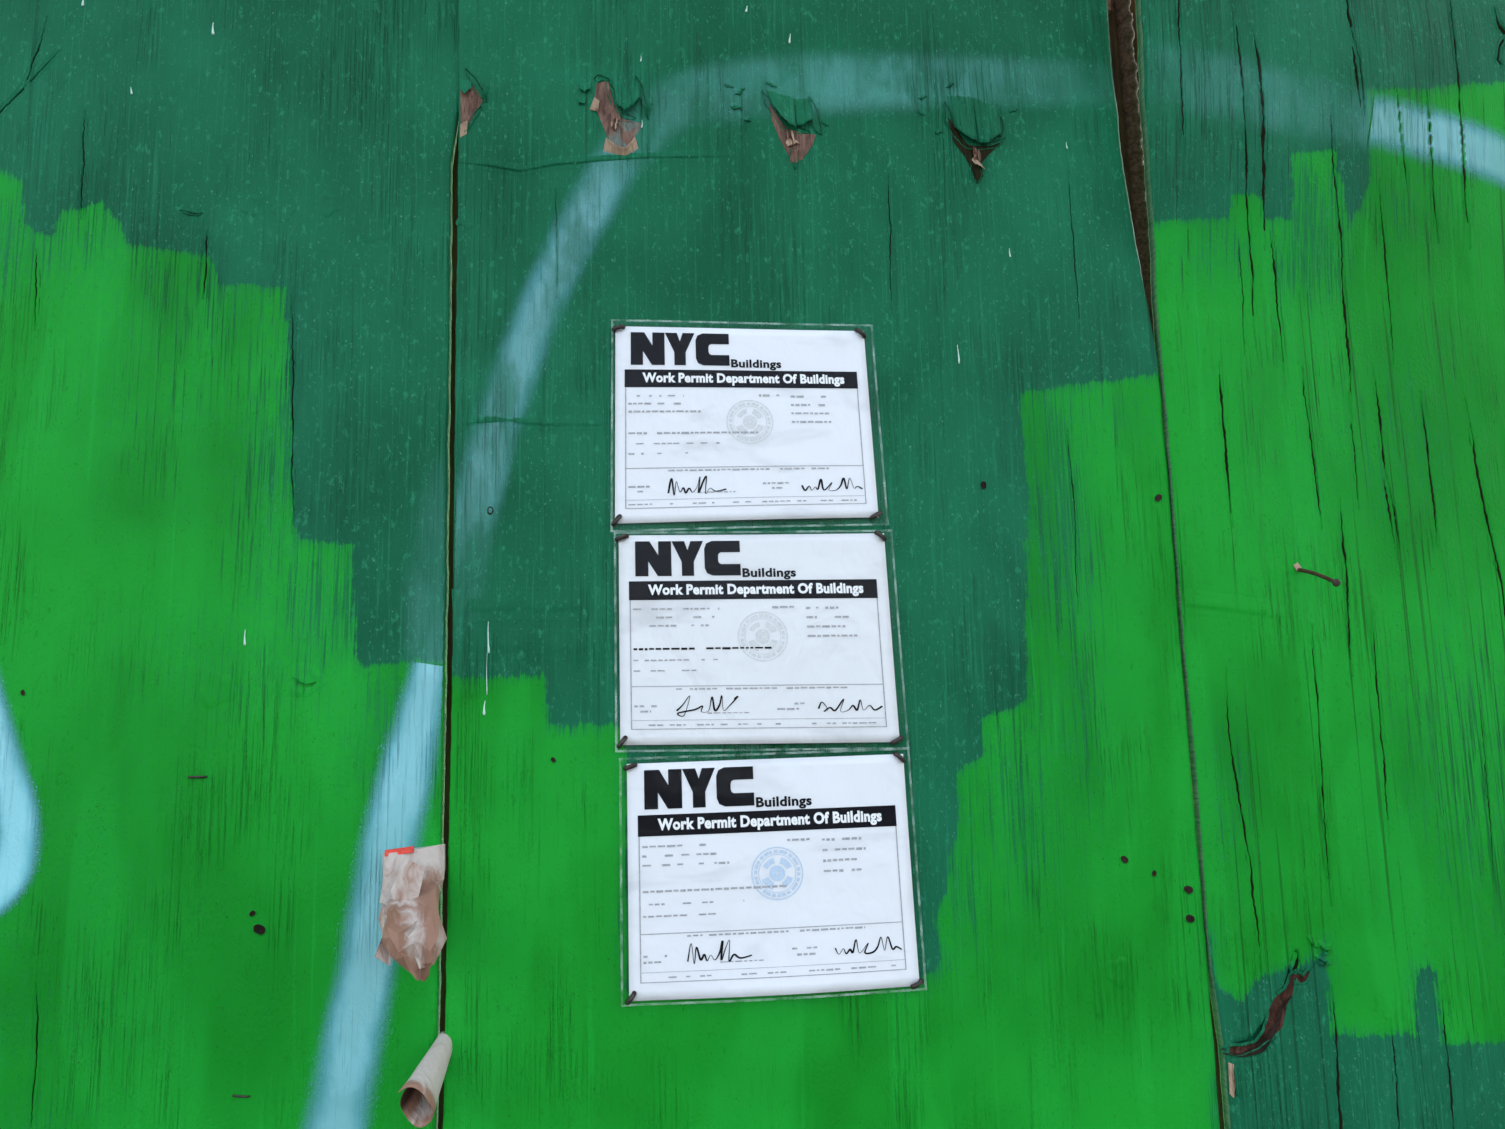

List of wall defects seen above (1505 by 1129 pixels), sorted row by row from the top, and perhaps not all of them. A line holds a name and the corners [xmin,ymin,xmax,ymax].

peeling [460,68,491,138]
peeling [577,74,653,155]
peeling [725,80,830,169]
peeling [935,81,1018,184]
crack [1176,0,1187,154]
crack [1217,0,1505,906]
crack [1221,665,1345,1129]
crack [1388,1018,1402,1129]
crack [1439,981,1456,1129]